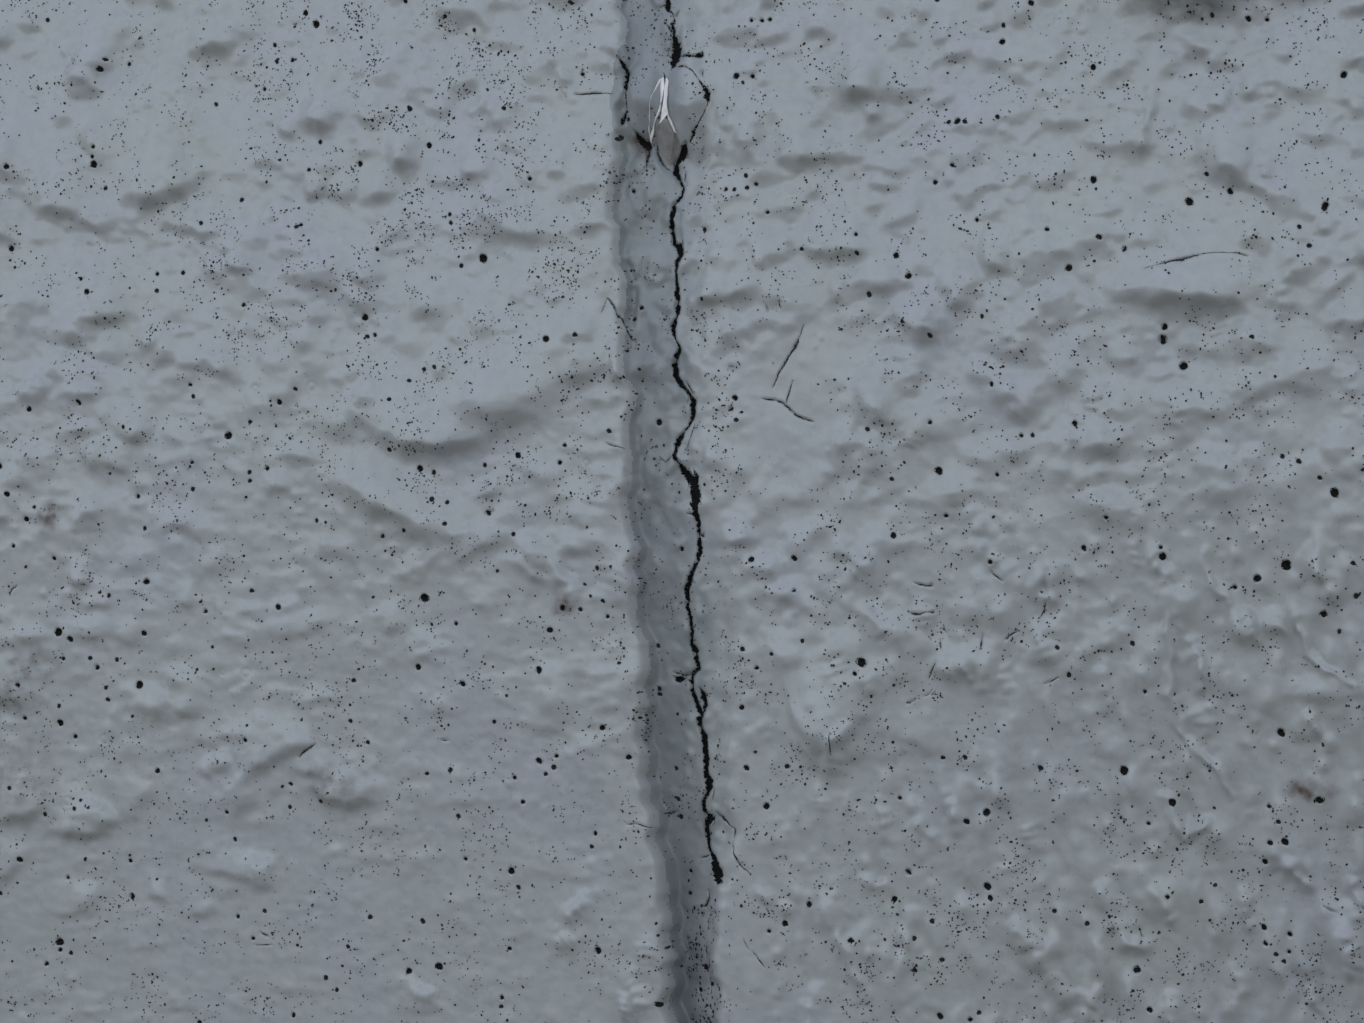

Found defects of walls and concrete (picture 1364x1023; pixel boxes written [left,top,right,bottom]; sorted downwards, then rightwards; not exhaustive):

crack [576,0,750,1023]